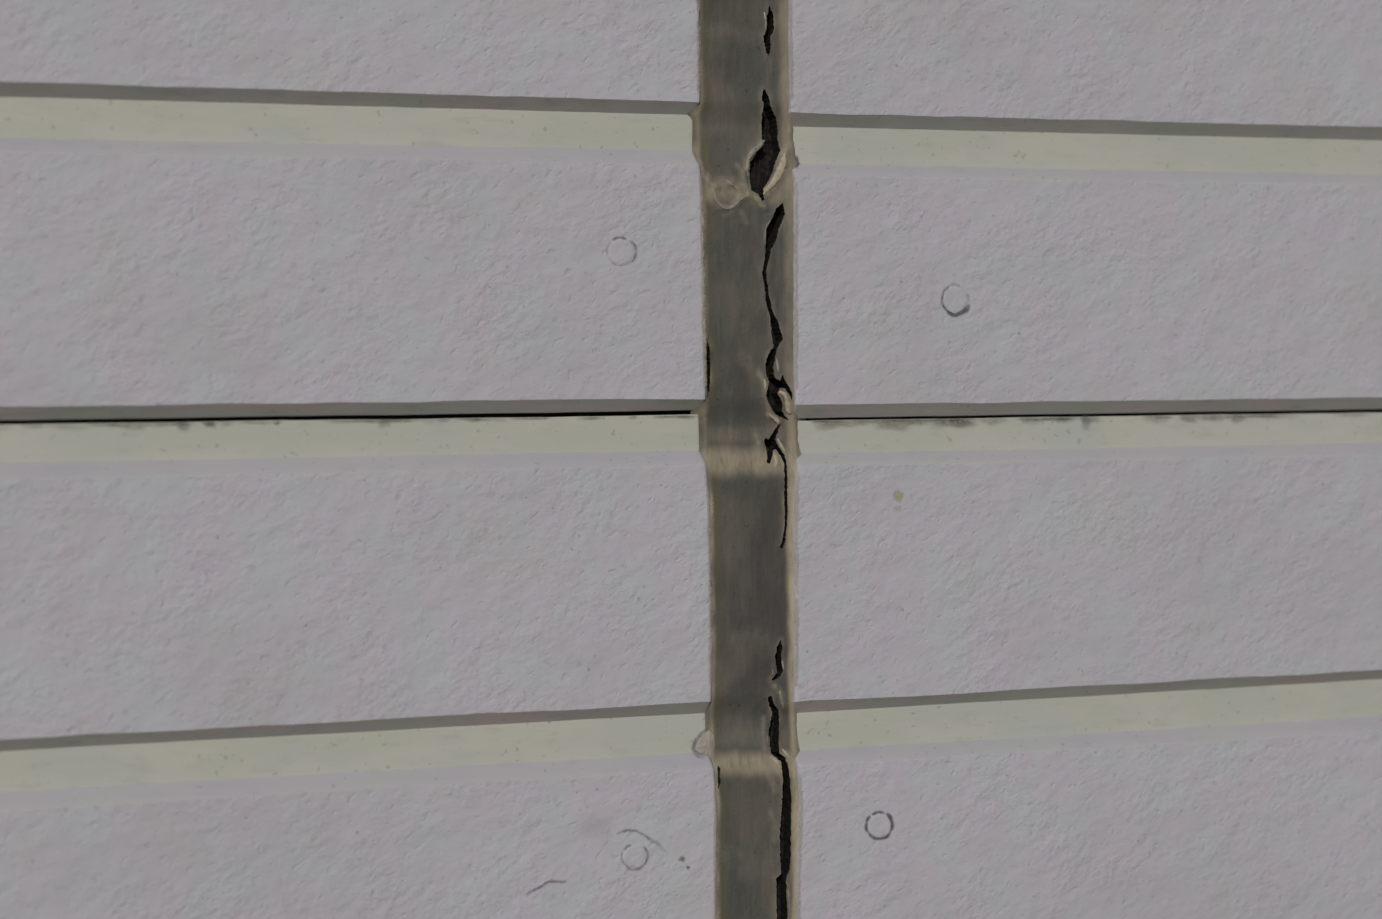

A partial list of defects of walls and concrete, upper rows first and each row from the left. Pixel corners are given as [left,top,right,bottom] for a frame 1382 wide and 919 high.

crack [763,6,774,55]
crack [714,89,792,548]
crack [767,640,792,919]